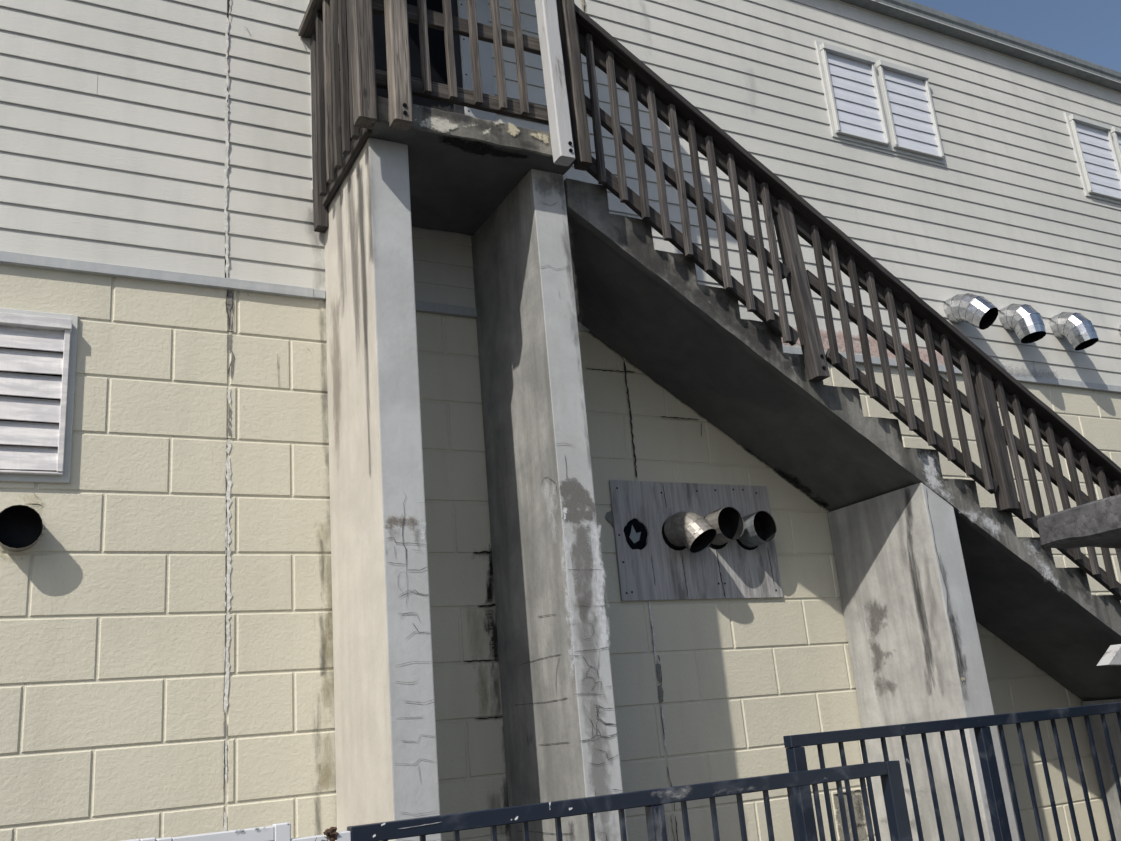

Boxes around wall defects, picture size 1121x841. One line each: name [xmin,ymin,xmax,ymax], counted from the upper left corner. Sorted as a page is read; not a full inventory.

peeling [414,106,548,143]
crack [587,361,637,477]
water stain [556,443,609,647]
crack [223,456,232,831]
crack [386,495,437,783]
water stain [464,550,499,662]
water stain [871,603,892,689]
crack [514,604,624,841]
crack [667,767,678,841]